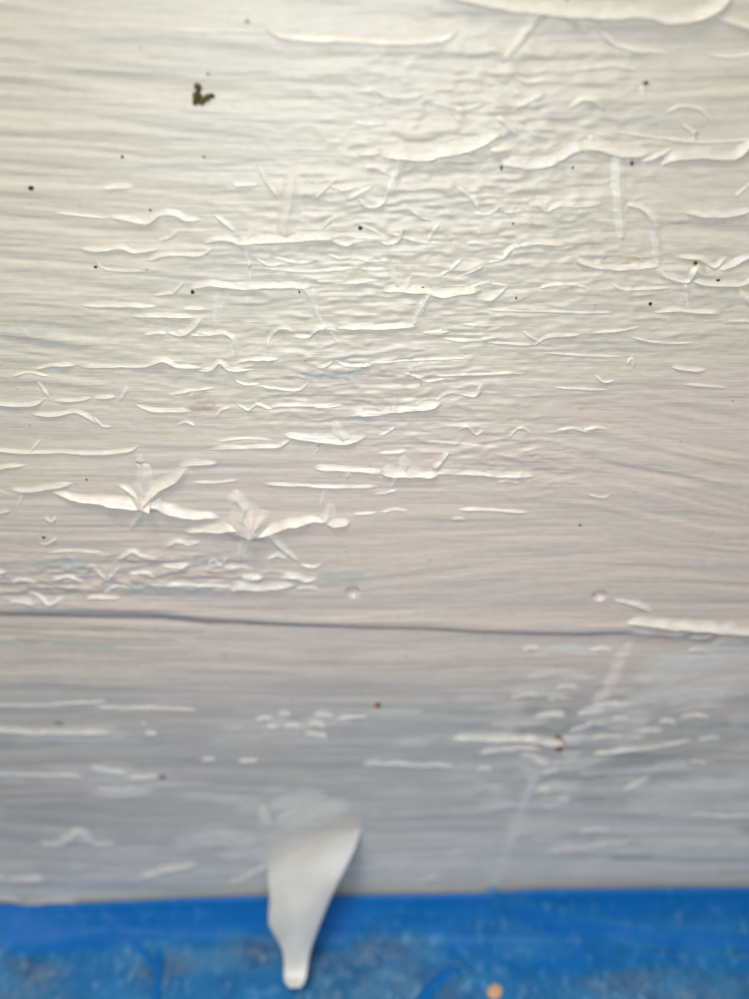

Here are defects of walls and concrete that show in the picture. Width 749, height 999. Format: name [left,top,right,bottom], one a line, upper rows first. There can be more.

peeling [102,182,134,190]
peeling [165,538,201,548]
peeling [0,568,85,607]
peeling [85,547,322,600]
peeling [613,598,749,652]
peeling [228,829,361,988]